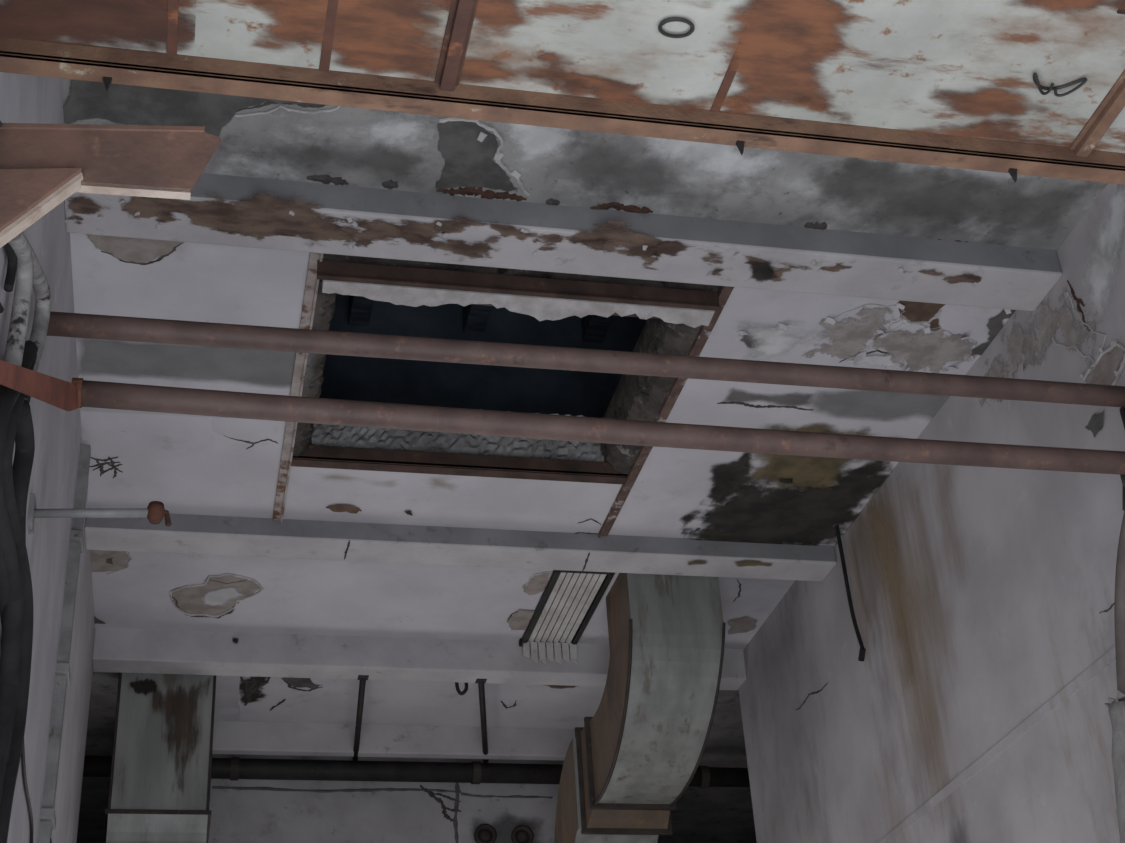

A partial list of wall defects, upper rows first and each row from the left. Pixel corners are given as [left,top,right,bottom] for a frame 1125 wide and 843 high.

rust [255,0,451,78]
rust [460,0,851,115]
rust [1019,0,1125,13]
leakage [281,114,433,176]
flaking render [436,117,530,196]
leakage [508,123,570,171]
leakage [578,137,782,194]
leakage [821,158,1071,228]
rust [900,89,1071,147]
peeling [65,193,692,270]
peeling [805,288,1125,386]
flaking render [169,573,264,619]